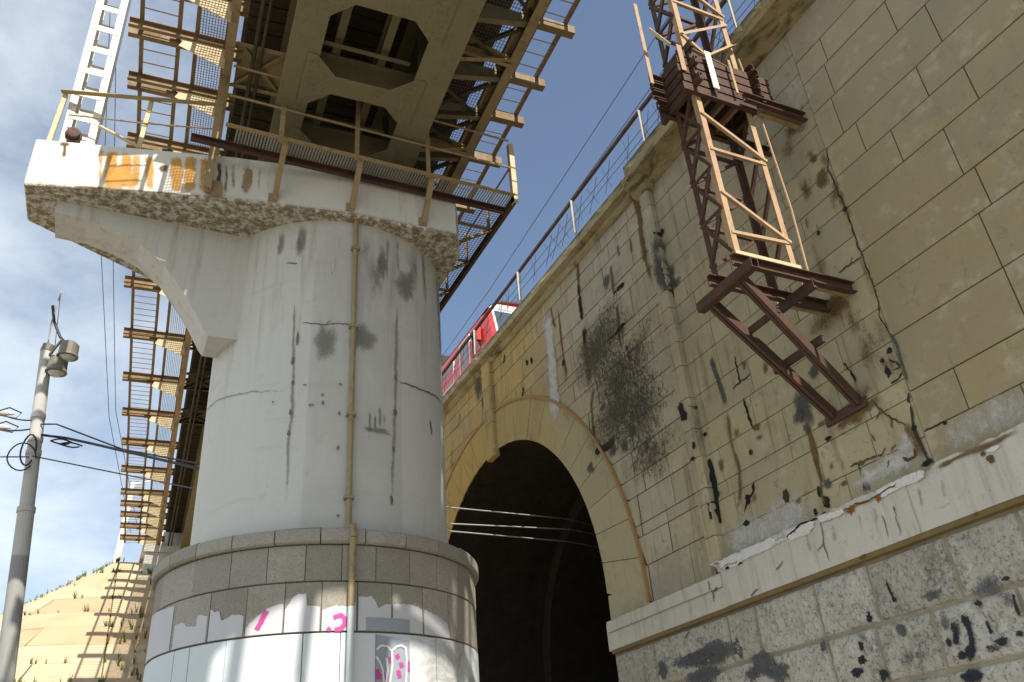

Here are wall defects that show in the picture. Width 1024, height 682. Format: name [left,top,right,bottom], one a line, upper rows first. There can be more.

crack [206,390,266,411]
damp [576,297,698,486]
peeling [710,432,924,572]
crack [827,153,947,490]
spalling [980,445,1000,463]
damp [658,636,789,682]